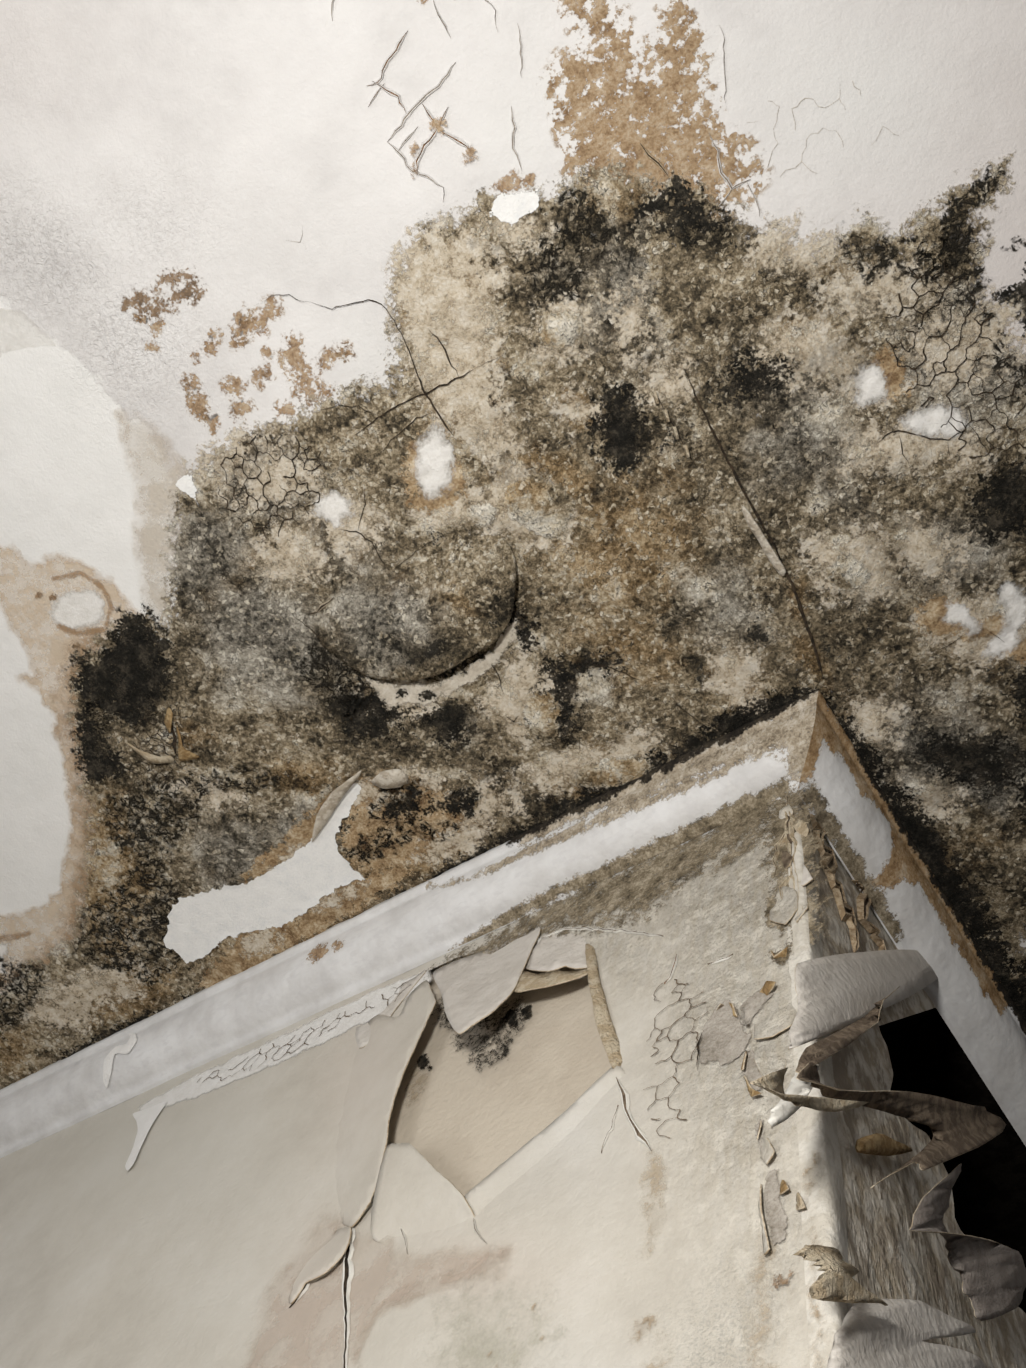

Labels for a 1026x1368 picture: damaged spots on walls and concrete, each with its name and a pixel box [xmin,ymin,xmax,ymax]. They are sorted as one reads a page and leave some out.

crack [367,0,477,201]
crack [485,0,523,74]
crack [511,107,522,170]
water stain [0,154,1026,1089]
crack [652,372,823,676]
flaking render [164,765,485,990]
peeling [288,925,625,1304]
peeling [696,782,1026,1368]
crack [289,1196,374,1368]